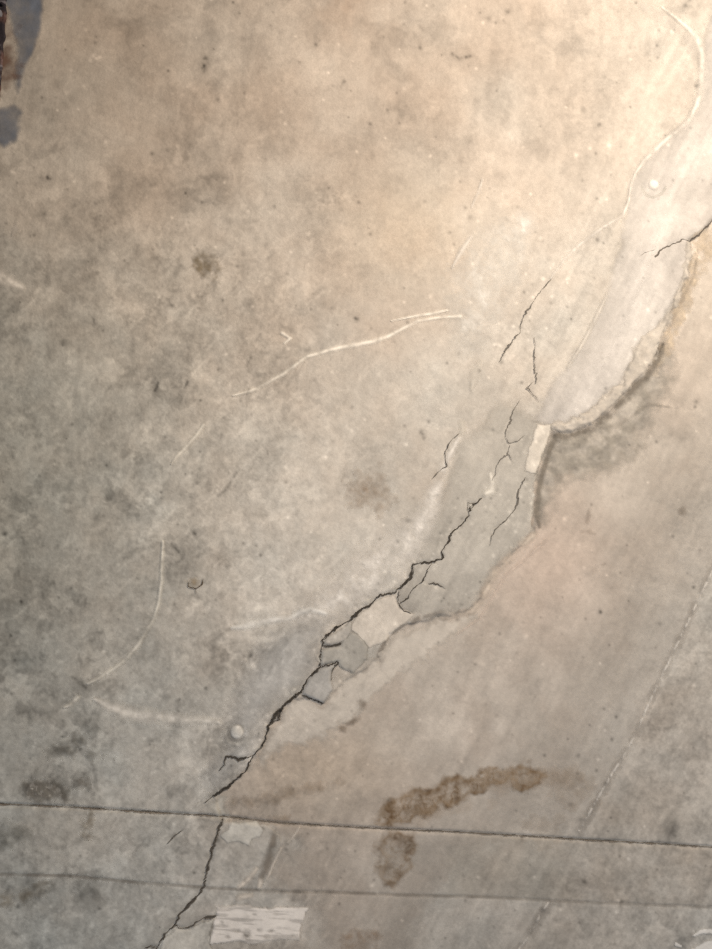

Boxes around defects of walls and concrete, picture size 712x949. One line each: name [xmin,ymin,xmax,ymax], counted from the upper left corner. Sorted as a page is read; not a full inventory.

crack [642,221,712,257]
crack [145,280,551,949]
spalling [209,220,712,949]